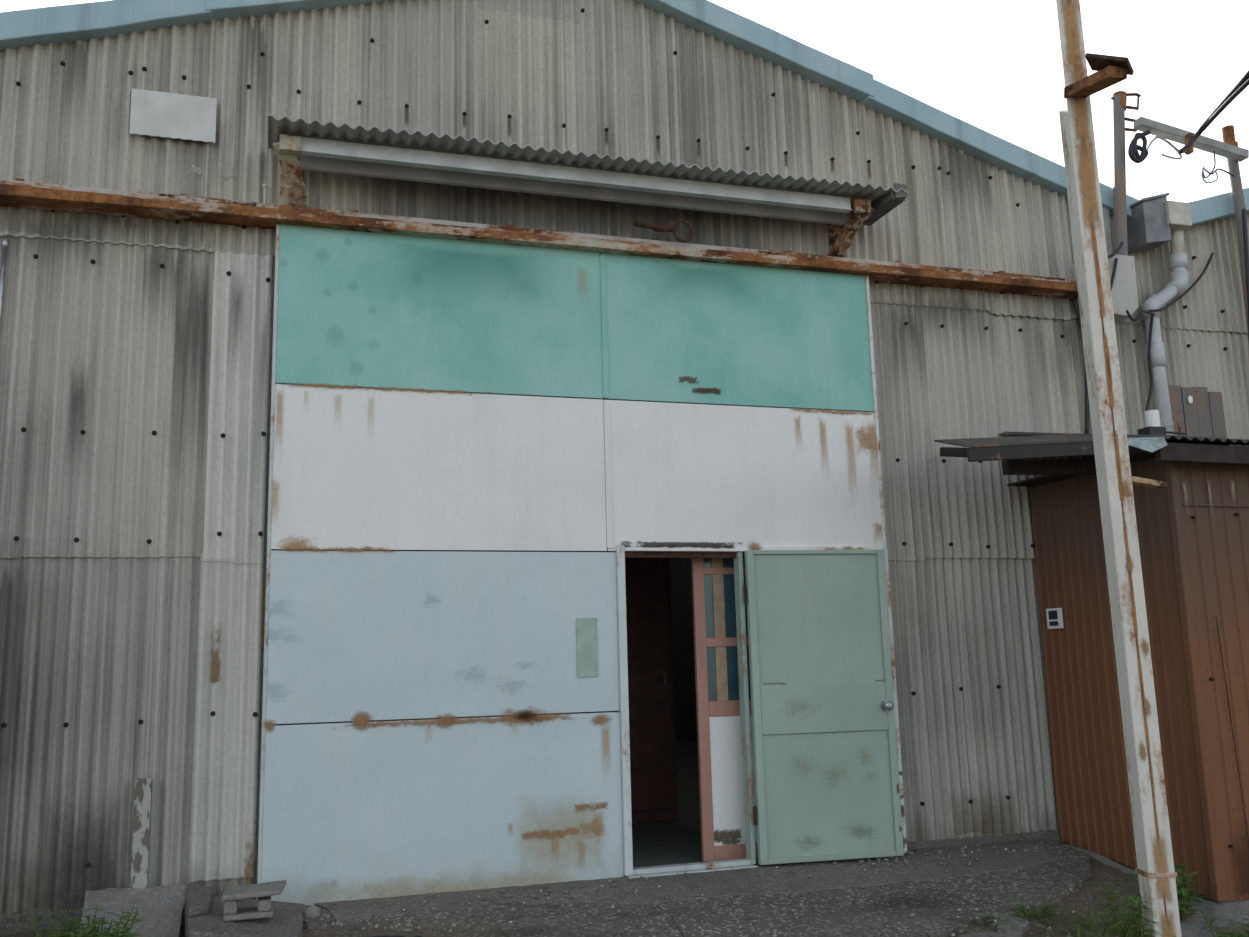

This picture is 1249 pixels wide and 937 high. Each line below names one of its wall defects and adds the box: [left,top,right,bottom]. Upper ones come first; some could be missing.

corrosion [1063,1,1083,83]
corrosion [1075,98,1105,317]
water stain [70,387,85,430]
corrosion [794,408,877,451]
corrosion [1103,335,1114,420]
corrosion [1113,434,1130,500]
corrosion [284,540,393,552]
corrosion [348,709,568,729]
corrosion [1124,522,1177,937]
corrosion [509,803,607,855]
water stain [63,831,108,909]